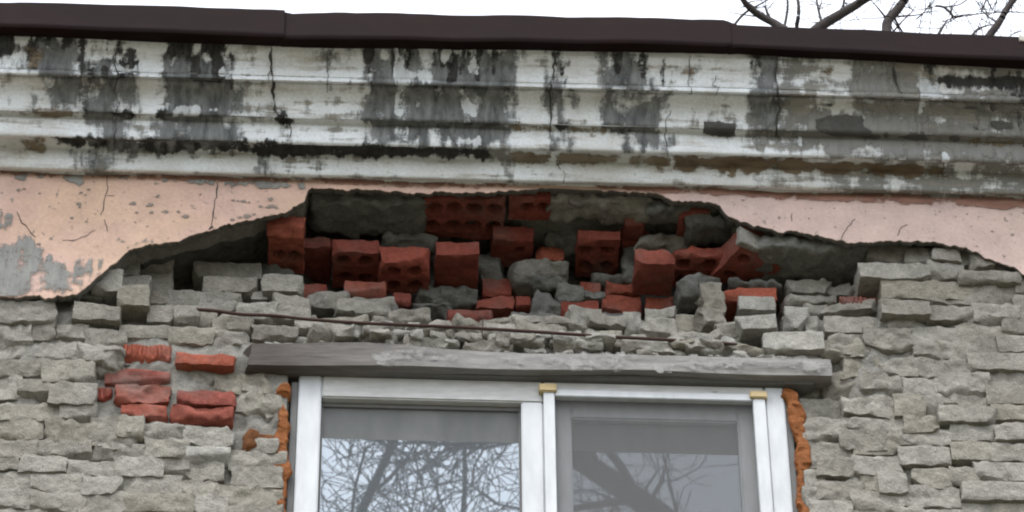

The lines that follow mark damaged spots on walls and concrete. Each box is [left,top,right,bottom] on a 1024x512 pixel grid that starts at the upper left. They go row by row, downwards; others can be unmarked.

crack [267,45,292,137]
leakage [0,35,675,175]
spalling [703,121,736,137]
crack [774,55,782,141]
spalling [815,104,929,140]
leakage [747,55,1024,166]
spalling [964,103,1013,131]
peeling [0,173,44,230]
peeling [0,235,103,297]
spalling [140,229,344,292]
spalling [187,179,736,322]
spalling [639,235,875,320]